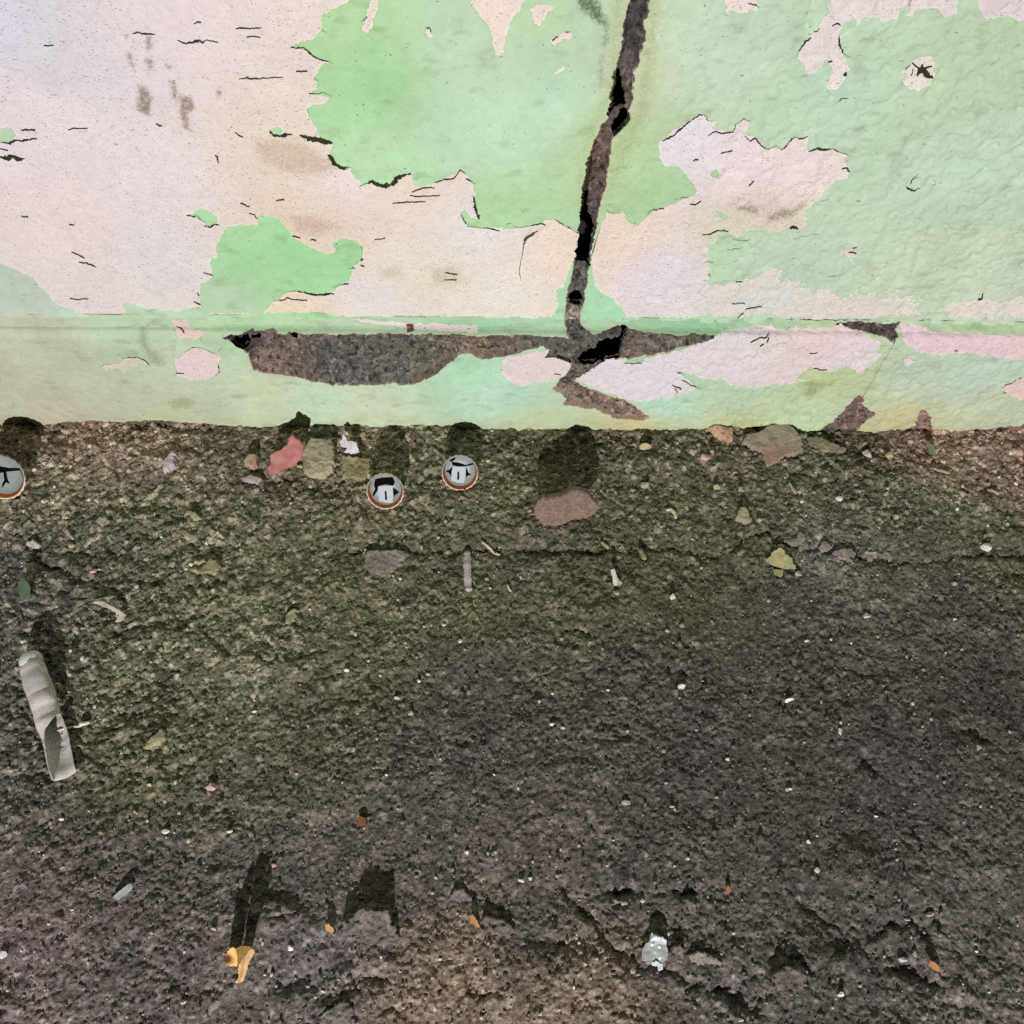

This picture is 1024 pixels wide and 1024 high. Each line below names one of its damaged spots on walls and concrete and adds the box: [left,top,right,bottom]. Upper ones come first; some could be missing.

peeling [0,0,1024,401]
crack [545,0,648,417]